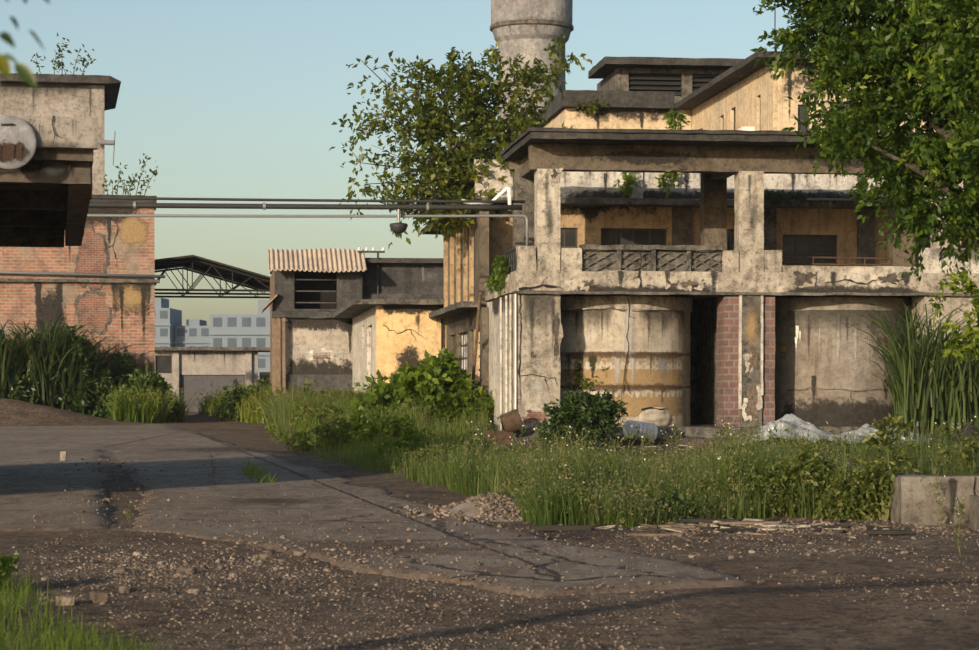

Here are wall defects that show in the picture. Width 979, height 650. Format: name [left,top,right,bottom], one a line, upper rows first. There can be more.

spalling [789,267,817,288]
spalling [876,273,902,288]
leakage [34,282,66,335]
leakage [111,284,151,336]
crack [518,251,669,405]
leakage [564,306,684,418]